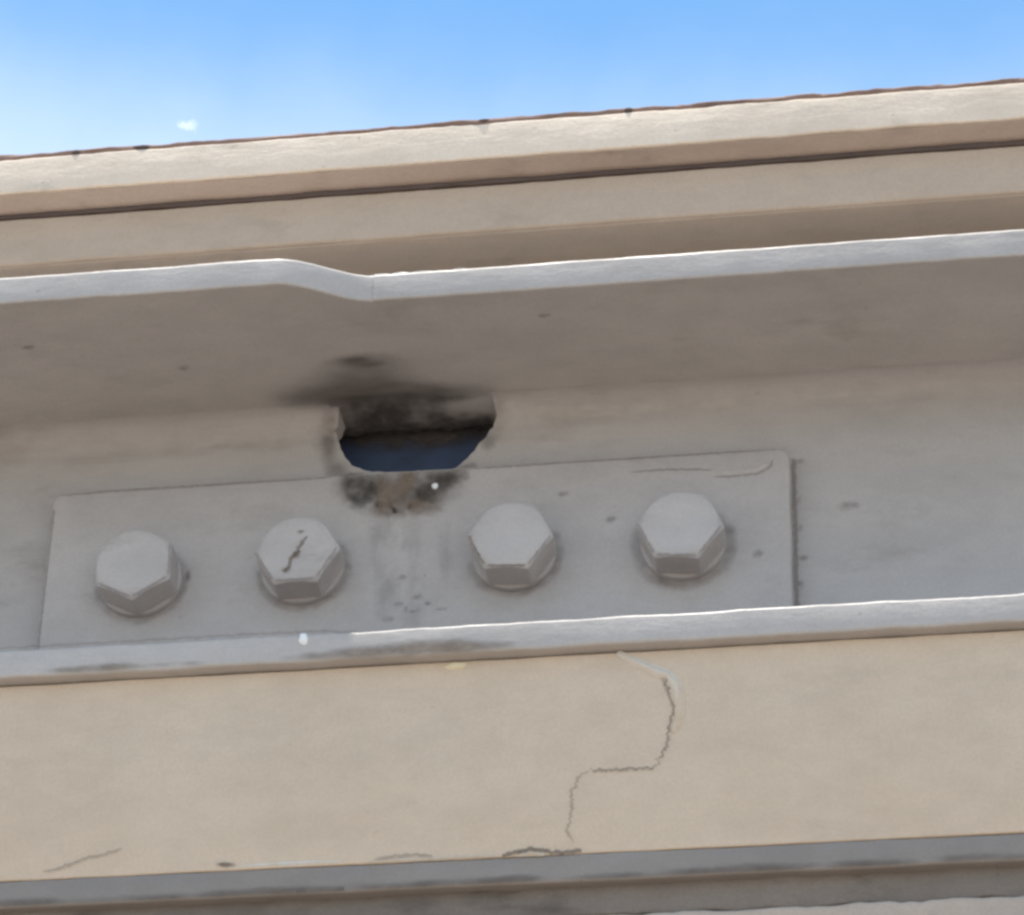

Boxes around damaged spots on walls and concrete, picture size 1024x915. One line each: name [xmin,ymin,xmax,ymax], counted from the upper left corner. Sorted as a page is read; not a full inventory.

water stain [343,397,494,436]
water stain [416,473,456,502]
crack [288,531,307,567]
crack [591,680,675,772]